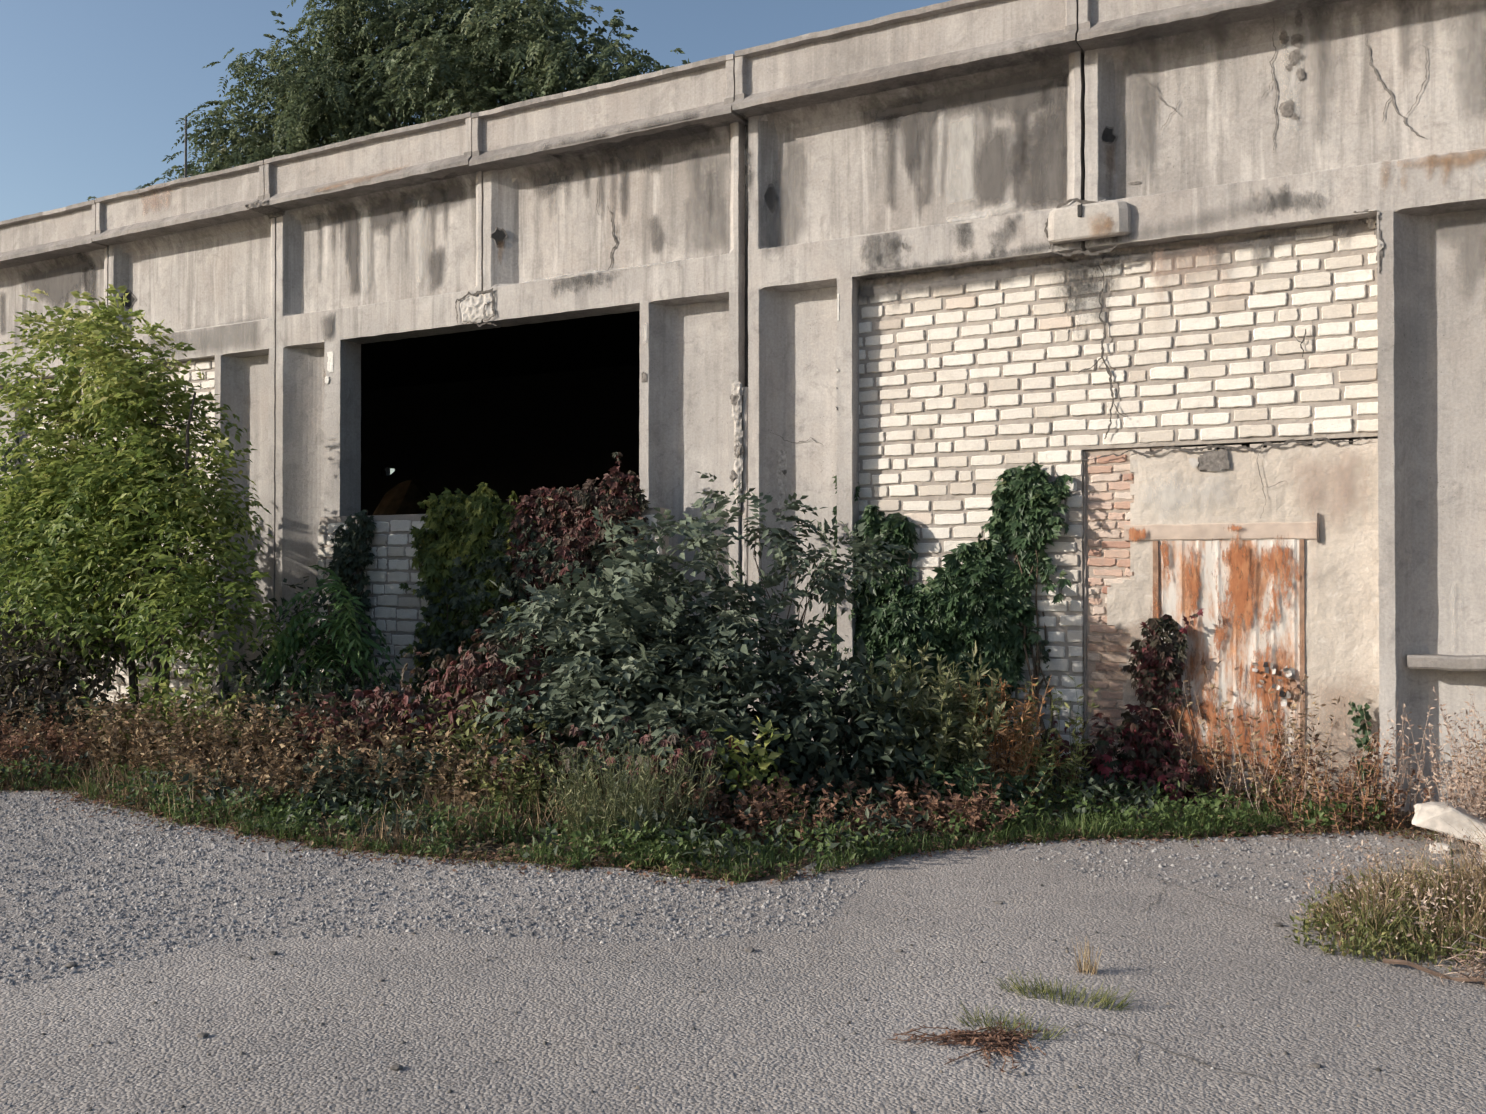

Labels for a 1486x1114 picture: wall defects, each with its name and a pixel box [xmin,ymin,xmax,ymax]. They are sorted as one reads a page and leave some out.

crack [1262,17,1278,150]
peeling [1279,3,1305,120]
crack [1365,38,1428,138]
water stain [309,176,465,292]
water stain [555,271,598,290]
water stain [531,115,730,210]
water stain [642,219,672,266]
water stain [858,51,1357,318]
crack [1044,198,1372,519]
spalling [730,382,744,511]
corrosion [1129,525,1303,800]